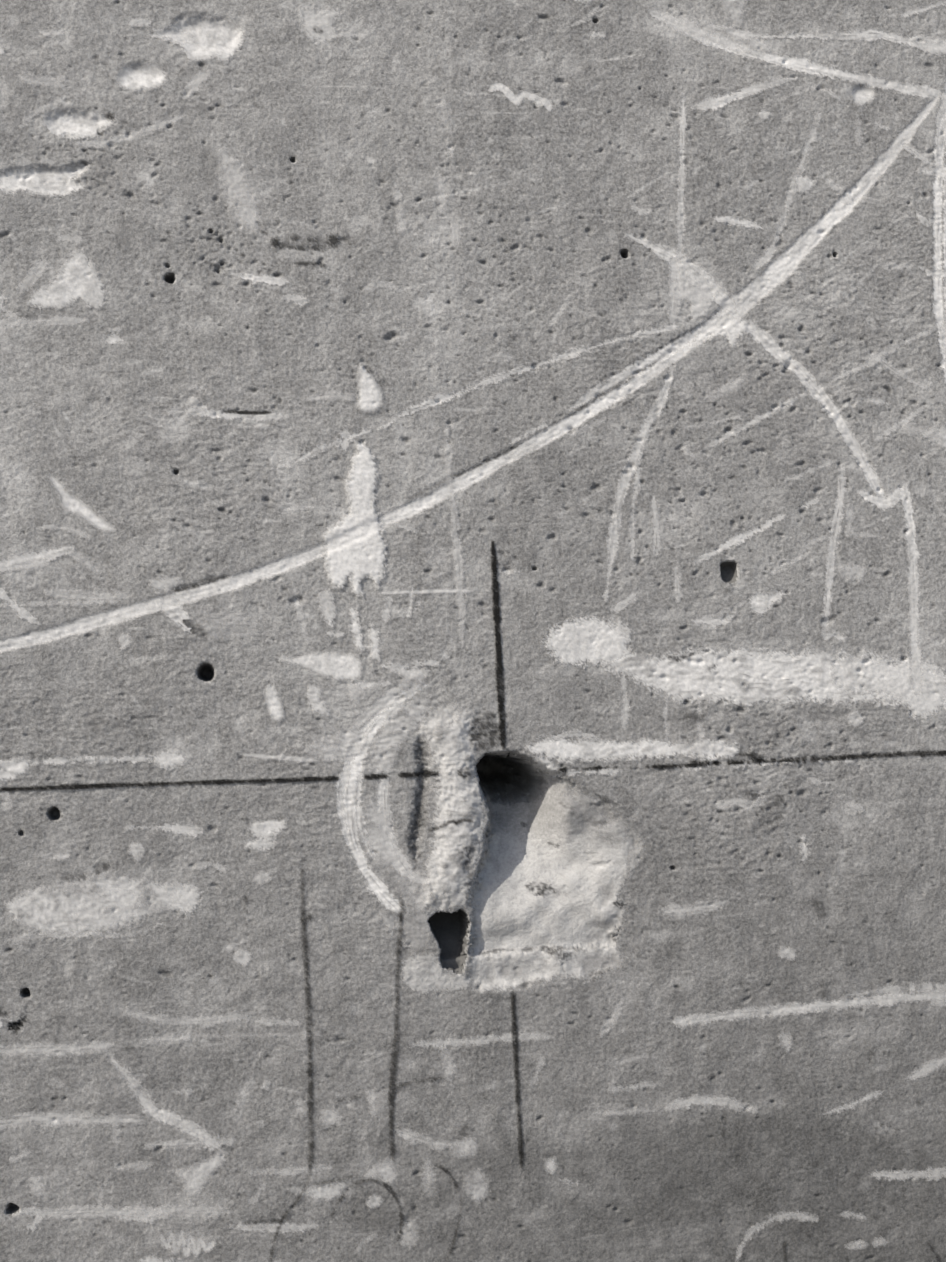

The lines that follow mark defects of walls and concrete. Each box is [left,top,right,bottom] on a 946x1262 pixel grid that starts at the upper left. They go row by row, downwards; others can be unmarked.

peeling [598,819,645,875]
peeling [379,911,431,949]